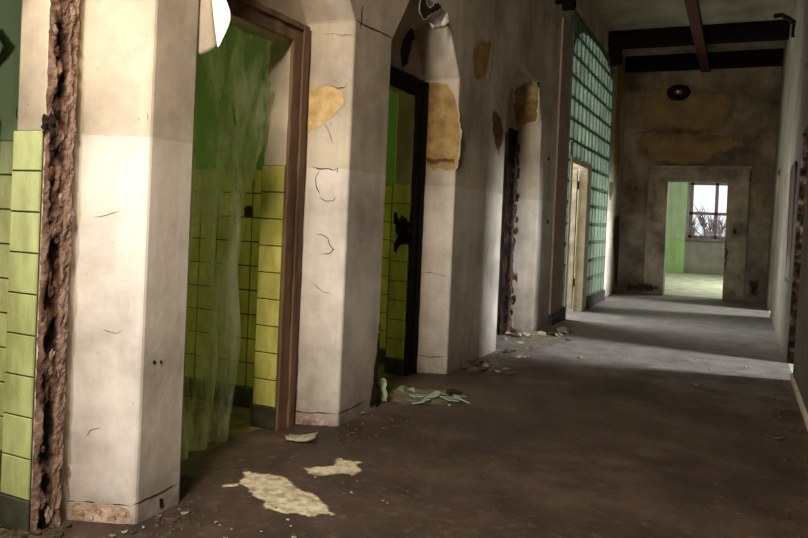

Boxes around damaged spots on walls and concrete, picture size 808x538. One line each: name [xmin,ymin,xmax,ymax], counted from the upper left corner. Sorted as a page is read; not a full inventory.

peeling [197,0,231,54]
flaking render [397,25,417,70]
flaking render [419,0,449,29]
peeling [306,84,346,143]
peeling [426,82,462,172]
crack [313,167,339,201]
spalling [500,80,540,335]
spalling [30,0,132,537]